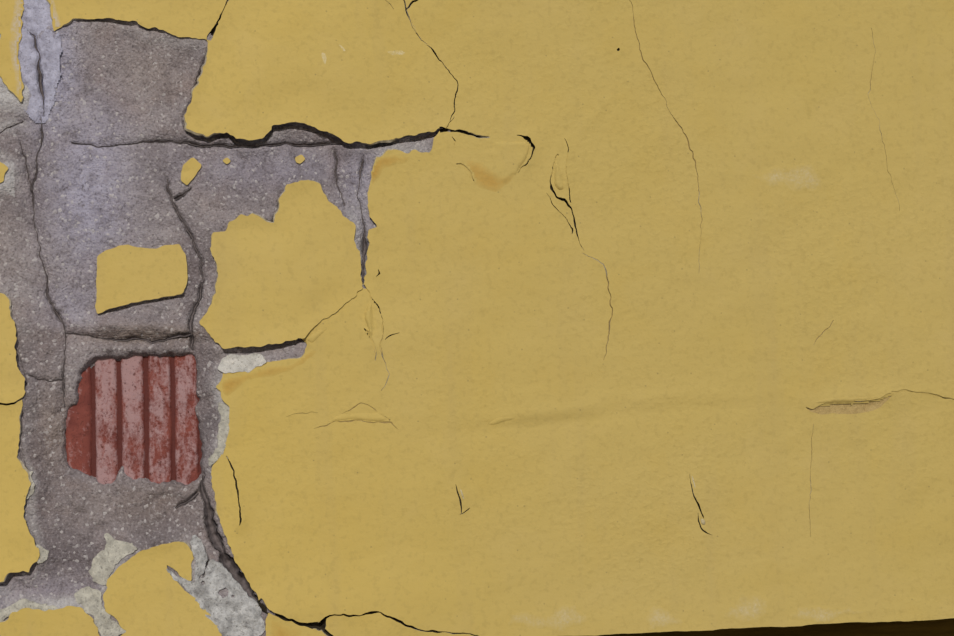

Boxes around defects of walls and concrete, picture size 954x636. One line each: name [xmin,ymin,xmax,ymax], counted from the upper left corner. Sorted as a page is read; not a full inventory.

crack [0,0,204,407]
crack [210,1,228,36]
crack [71,140,398,340]
crack [430,47,483,181]
crack [517,135,582,247]
crack [630,1,662,95]
crack [673,117,699,191]
spalling [0,0,458,636]
crack [604,274,613,358]
crack [175,459,478,636]